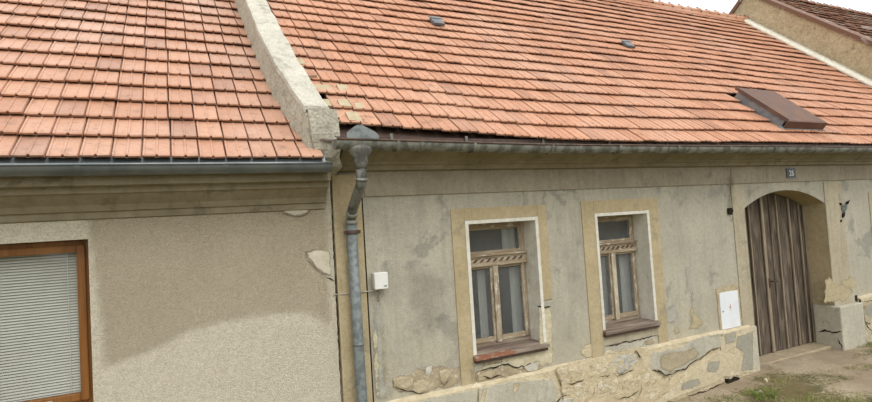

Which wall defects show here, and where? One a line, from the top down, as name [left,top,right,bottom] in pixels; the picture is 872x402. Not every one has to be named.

spalling [393,366,461,394]
spalling [475,307,684,402]
crack [609,335,718,382]
crack [686,377,740,396]